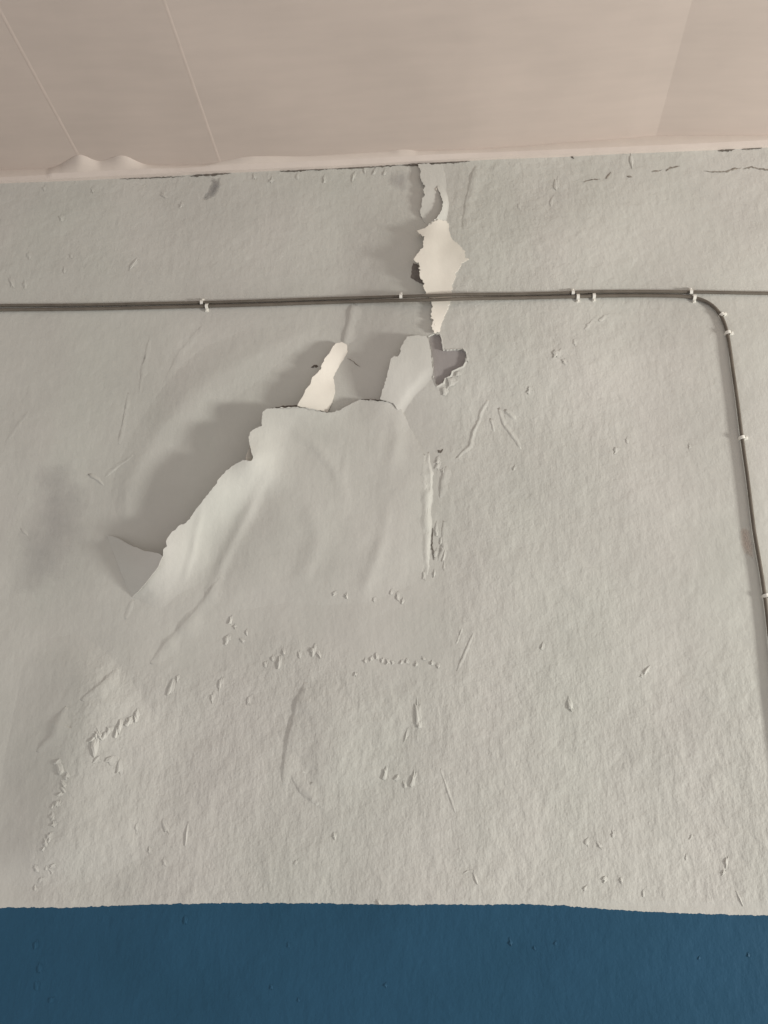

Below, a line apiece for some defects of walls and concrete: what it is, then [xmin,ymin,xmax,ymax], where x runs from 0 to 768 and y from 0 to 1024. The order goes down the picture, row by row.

peeling [107,163,470,665]